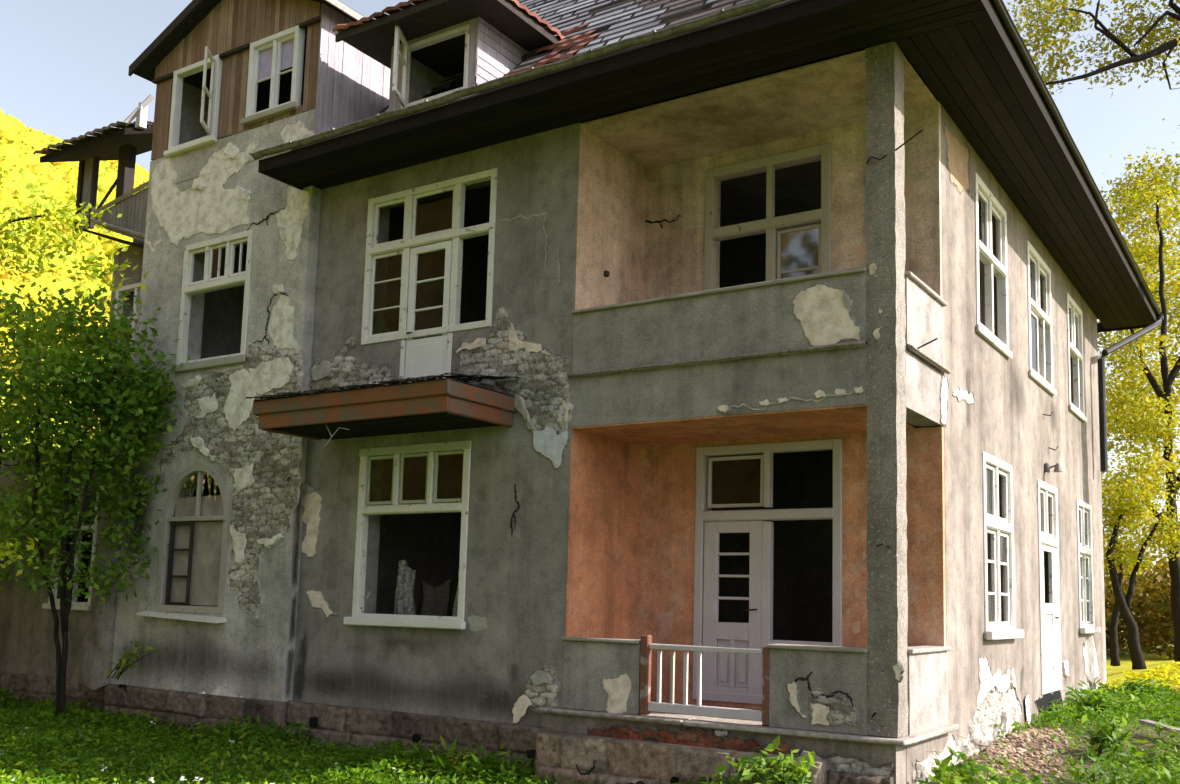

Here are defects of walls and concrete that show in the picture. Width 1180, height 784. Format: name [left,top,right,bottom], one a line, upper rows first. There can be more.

peeling [145,140,258,253]
peeling [275,185,311,261]
crack [645,215,681,228]
crack [253,292,289,344]
peeling [791,282,886,346]
flaking render [452,305,577,469]
flaking render [157,284,394,627]
crack [510,484,520,536]
flaking render [512,665,561,723]
spalling [586,671,896,777]
flaking render [911,655,1063,784]
peeling [1077,633,1106,699]